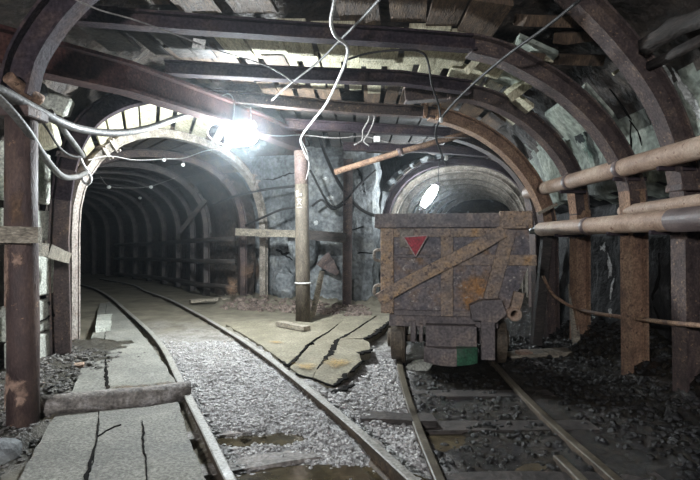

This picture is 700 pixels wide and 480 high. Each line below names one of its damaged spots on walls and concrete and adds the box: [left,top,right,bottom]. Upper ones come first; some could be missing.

crack [103,338,111,389]
crack [278,321,389,394]
crack [83,418,121,480]
crack [140,421,148,480]